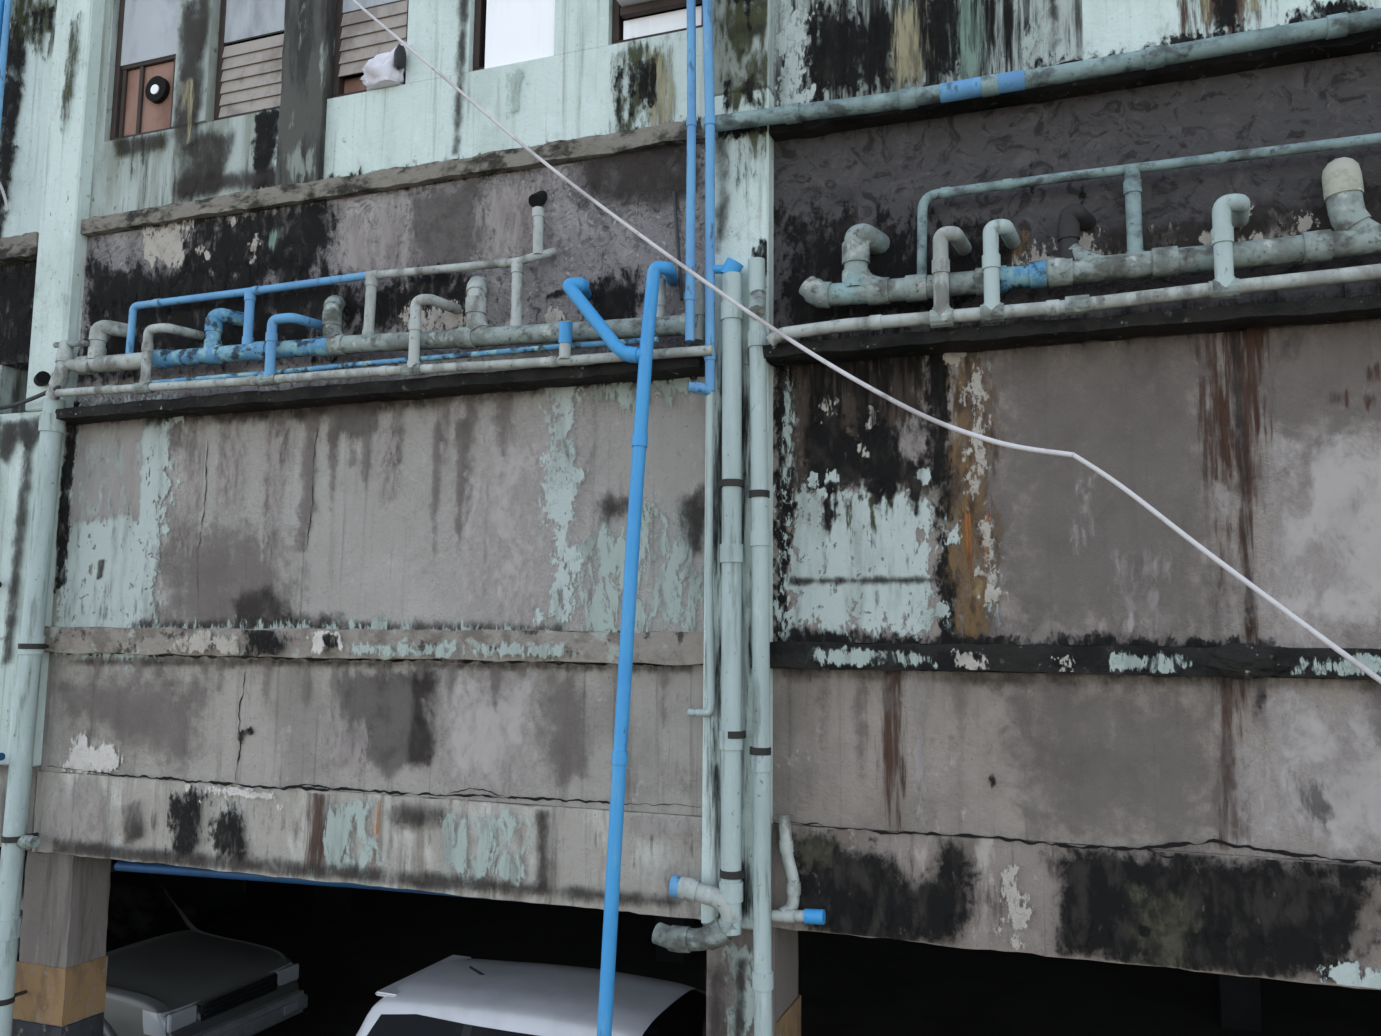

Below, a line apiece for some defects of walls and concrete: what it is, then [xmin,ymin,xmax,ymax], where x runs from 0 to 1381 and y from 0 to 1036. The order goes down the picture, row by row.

leakage [715,0,1123,113]
leakage [77,174,495,385]
peeling [53,377,705,672]
peeling [773,353,1008,670]
rust [946,352,1005,643]
rust [1195,326,1272,643]
peeling [323,799,385,876]
crack [48,654,704,807]
leakage [792,830,981,944]
crack [791,821,1381,865]
leakage [952,673,1381,980]
peeling [1319,961,1381,989]